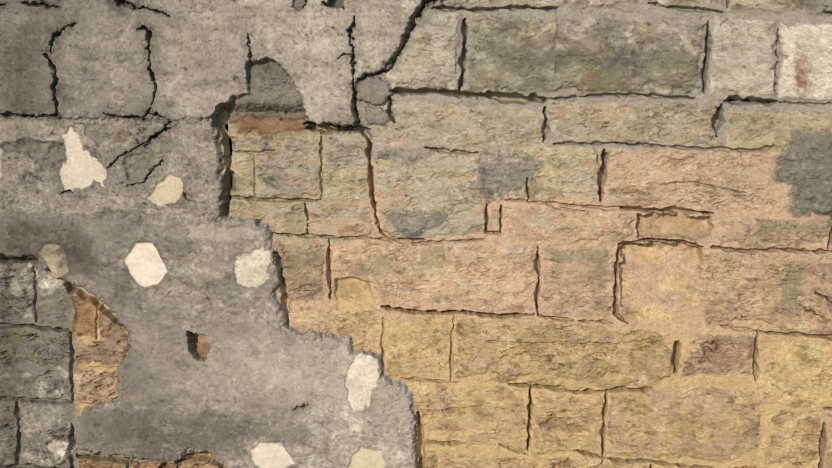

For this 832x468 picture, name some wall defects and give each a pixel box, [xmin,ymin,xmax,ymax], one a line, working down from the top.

spalling [288,0,308,13]
spalling [324,0,344,16]
crack [115,0,170,90]
spalling [350,0,428,104]
peeling [0,122,113,192]
crack [104,110,172,169]
peeling [143,176,183,208]
spalling [180,60,419,468]
spalling [617,211,714,325]
spalling [0,240,229,468]
spalling [701,339,749,371]
spalling [539,418,592,433]